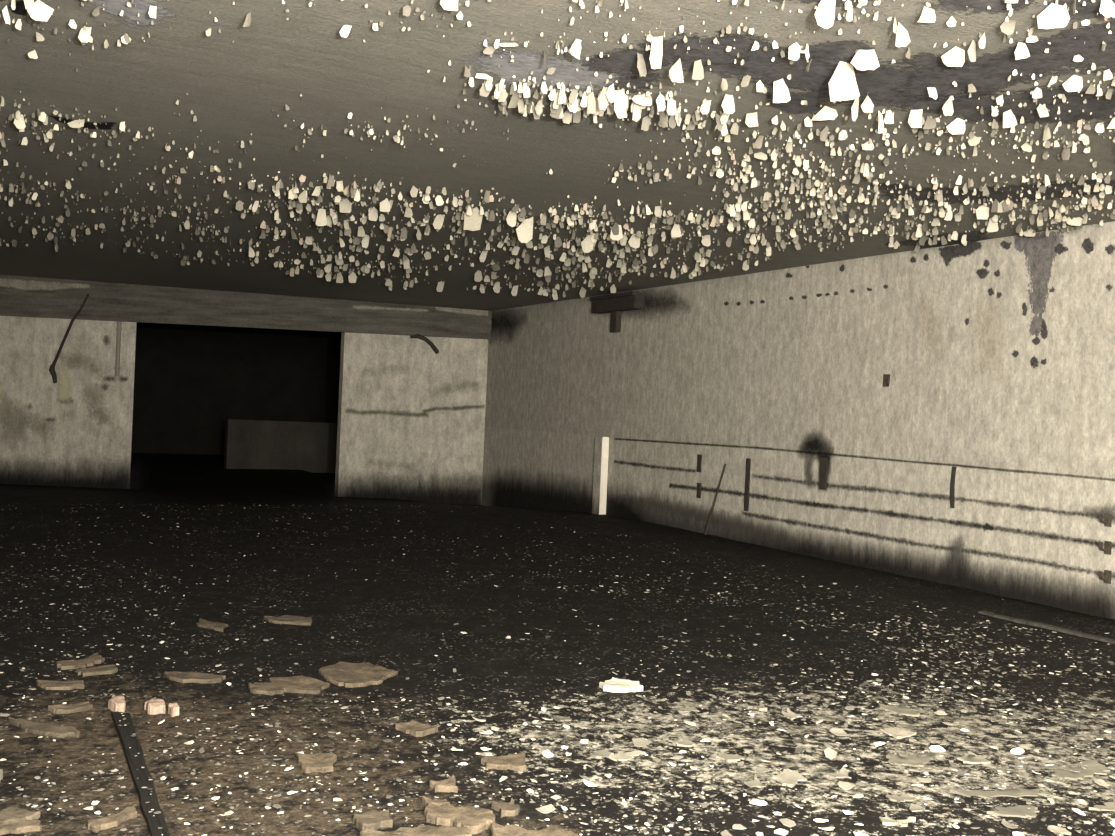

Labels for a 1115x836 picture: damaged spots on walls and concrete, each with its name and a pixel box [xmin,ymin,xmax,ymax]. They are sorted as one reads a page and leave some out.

peeling [0,0,1115,368]
crack [352,406,482,416]